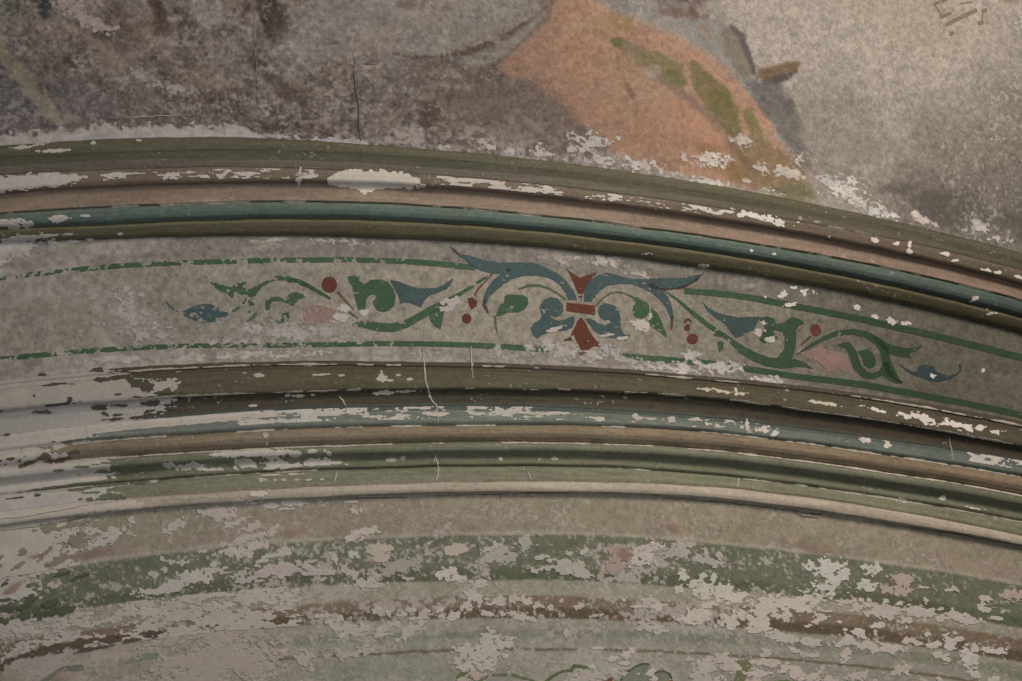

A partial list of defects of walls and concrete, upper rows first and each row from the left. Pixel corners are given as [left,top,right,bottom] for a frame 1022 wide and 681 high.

peeling [0,172,88,194]
peeling [0,212,94,275]
peeling [0,121,369,153]
spalling [153,166,426,195]
peeling [469,129,753,186]
peeling [730,208,799,227]
peeling [752,152,939,228]
peeling [645,416,1022,477]
spalling [687,448,1022,496]
peeling [782,393,1022,445]
peeling [0,351,604,681]
peeling [475,531,1022,681]